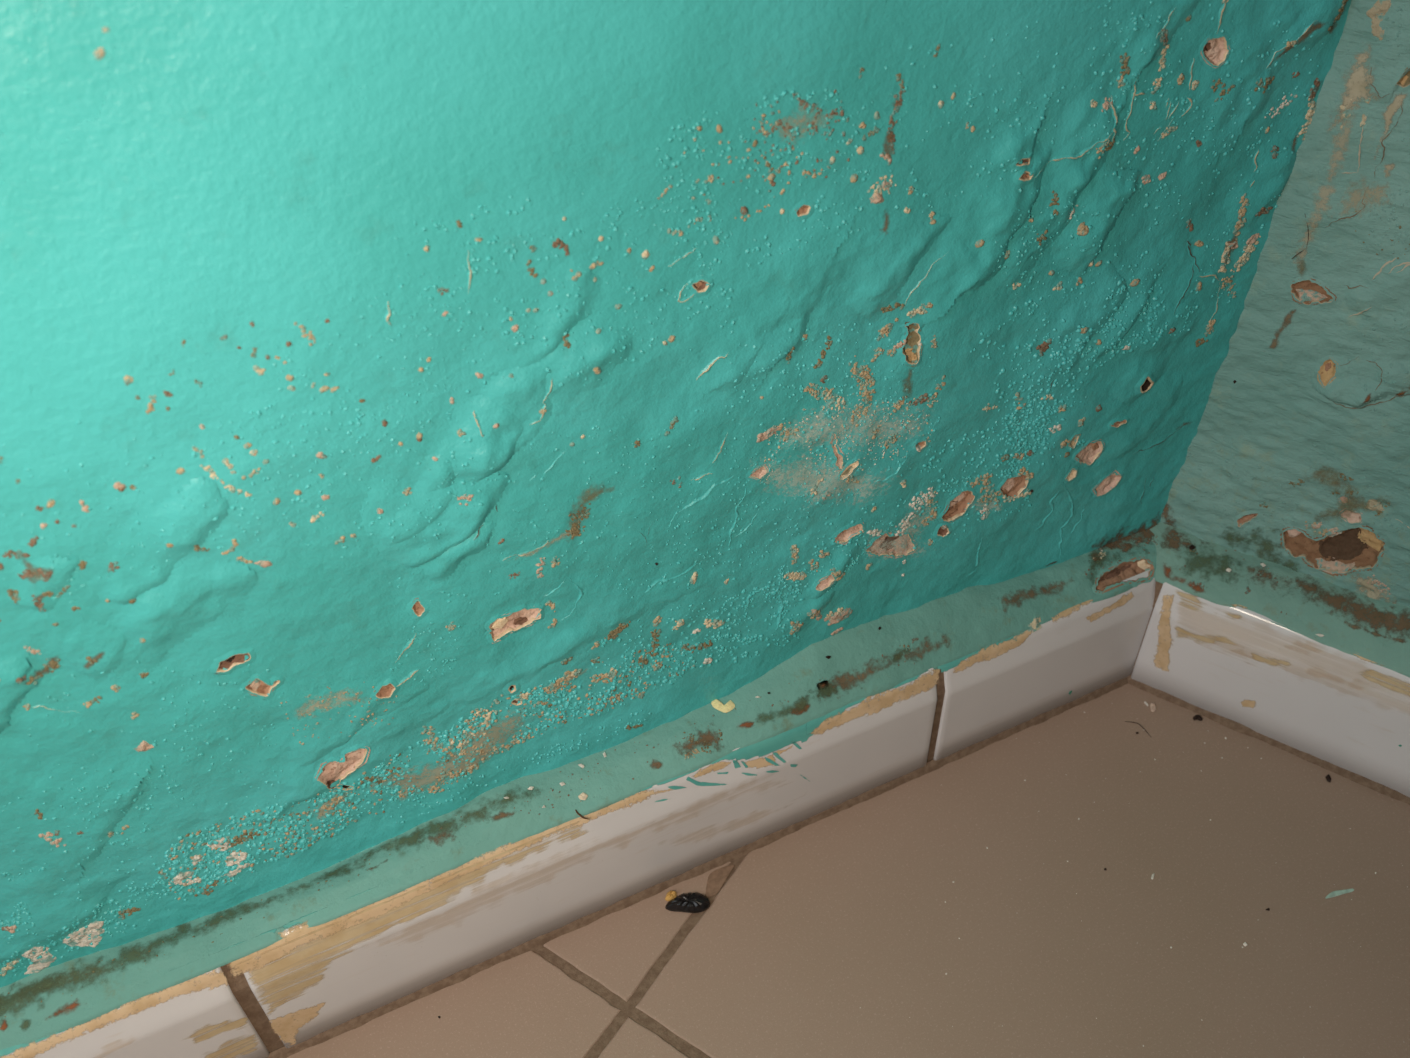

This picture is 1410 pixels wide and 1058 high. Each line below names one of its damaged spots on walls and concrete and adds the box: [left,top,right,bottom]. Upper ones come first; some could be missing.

crack [1325,67,1410,228]
spalling [830,520,918,576]
spalling [1279,499,1390,577]
spalling [1092,555,1156,596]
spalling [484,603,546,645]
water stain [811,608,853,635]
spalling [210,648,285,700]
spalling [312,744,372,792]
water stain [633,742,810,802]
water stain [173,837,250,884]
water stain [0,921,105,1006]
water stain [190,1018,248,1043]